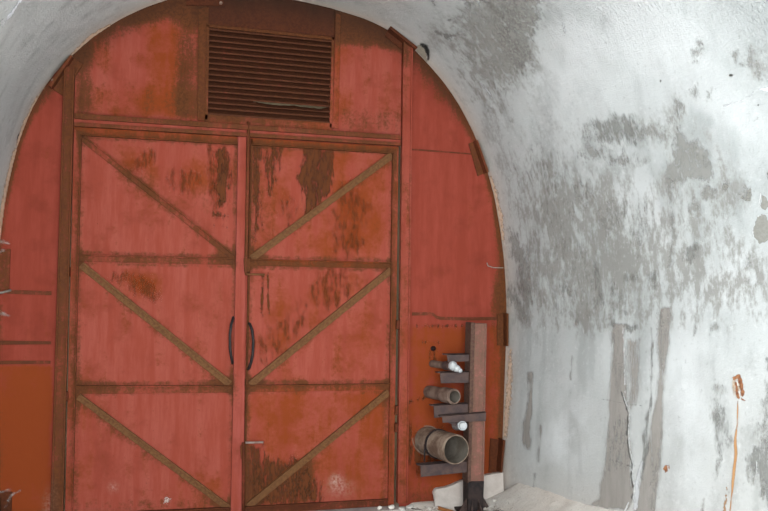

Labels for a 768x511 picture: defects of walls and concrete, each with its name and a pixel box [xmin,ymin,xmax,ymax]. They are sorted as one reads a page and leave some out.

rust [208,144,232,217]
rust [297,149,334,215]
water stain [588,116,664,157]
water stain [666,134,728,211]
peeling [741,189,768,244]
water stain [523,373,533,448]
water stain [592,307,671,511]
rust [248,445,322,505]
rust [723,429,737,511]
water stain [748,425,768,501]